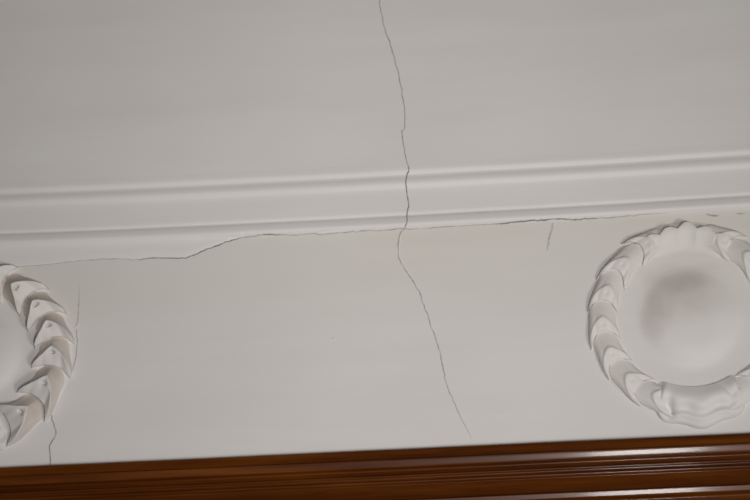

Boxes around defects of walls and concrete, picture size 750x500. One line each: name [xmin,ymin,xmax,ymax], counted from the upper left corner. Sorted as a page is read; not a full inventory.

crack [0,0,666,439]
crack [49,414,57,465]